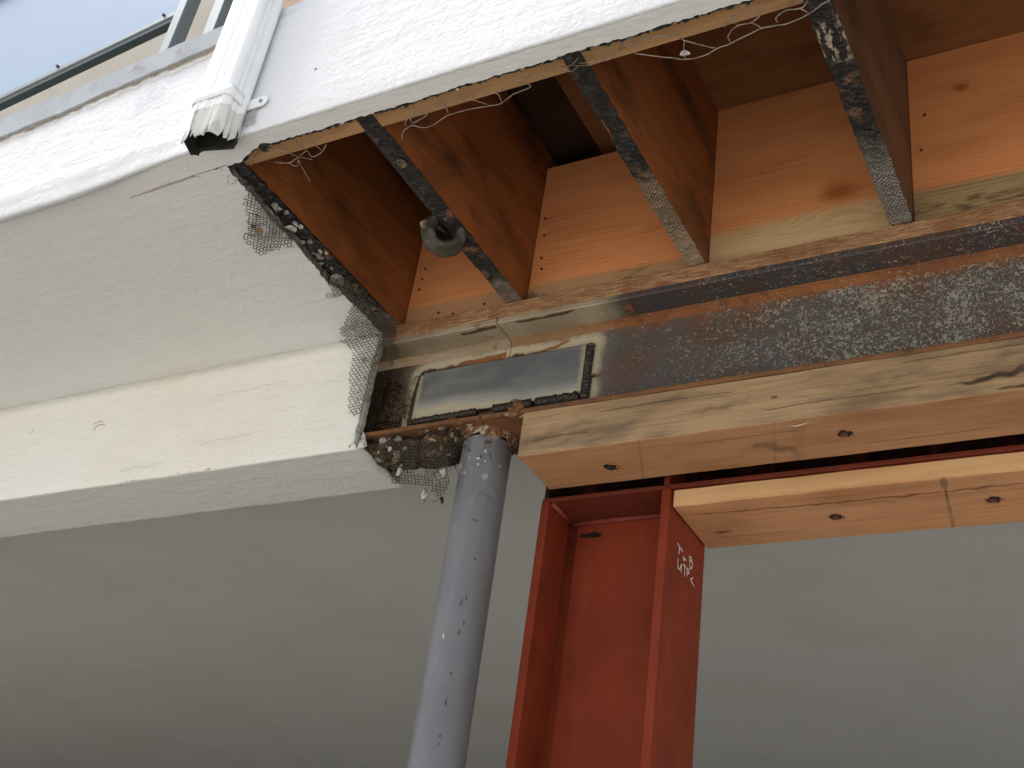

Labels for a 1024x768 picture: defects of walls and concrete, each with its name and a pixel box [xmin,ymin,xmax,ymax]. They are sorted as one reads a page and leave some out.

crack [131,165,226,198]
spalling [228,162,492,479]